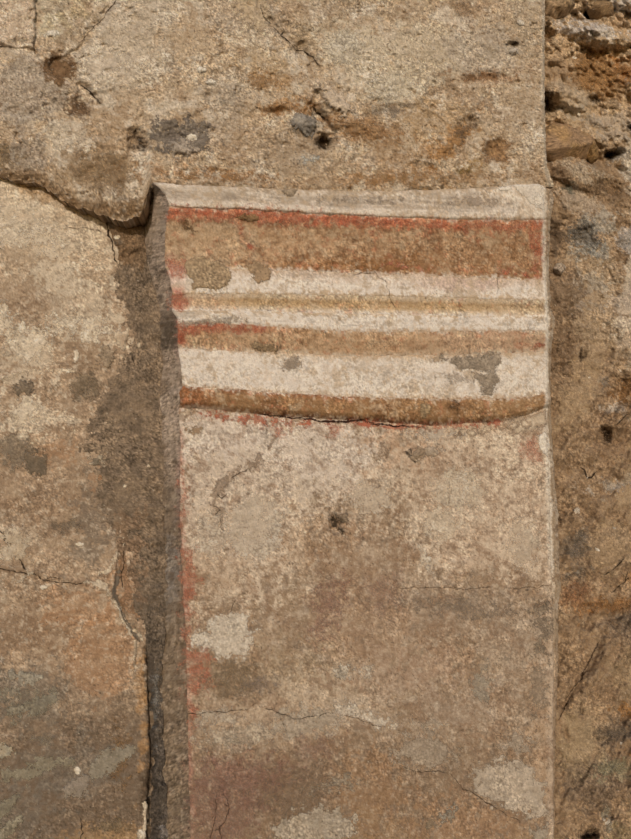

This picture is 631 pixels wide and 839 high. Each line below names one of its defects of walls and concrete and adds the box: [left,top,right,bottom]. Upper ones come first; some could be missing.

crack [0,531,143,672]